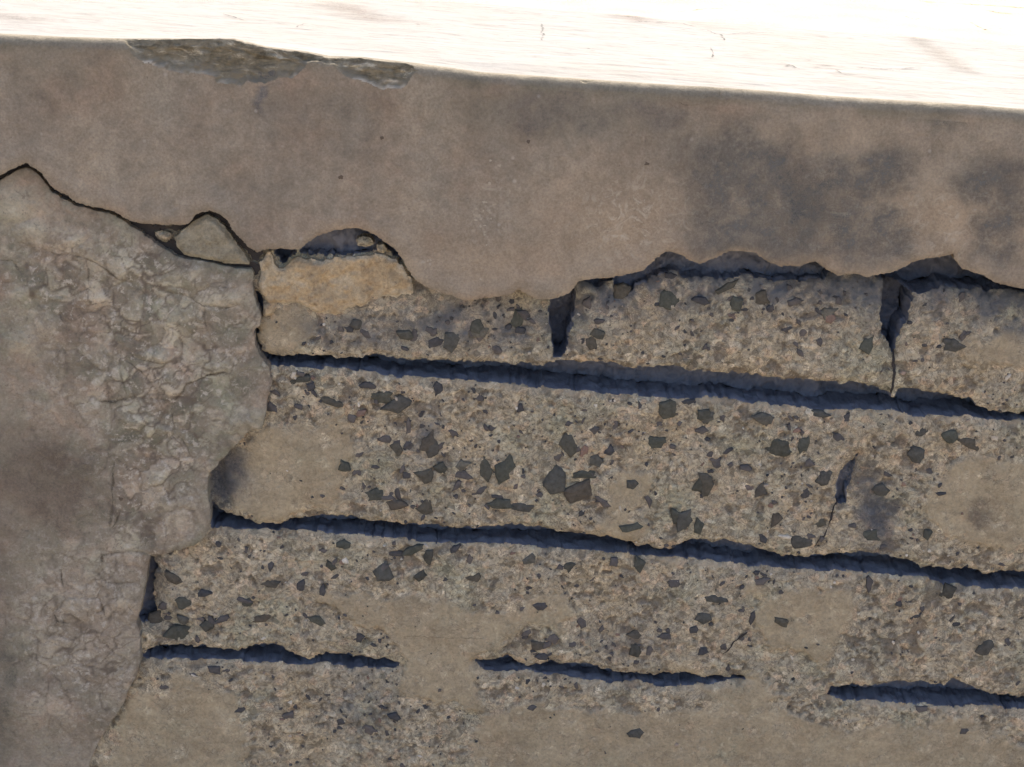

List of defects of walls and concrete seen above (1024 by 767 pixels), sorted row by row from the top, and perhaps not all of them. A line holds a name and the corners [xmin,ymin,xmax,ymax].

spalling [115,38,419,90]
water stain [693,132,909,256]
crack [889,349,897,394]
spalling [89,213,1024,767]
crack [814,500,838,547]